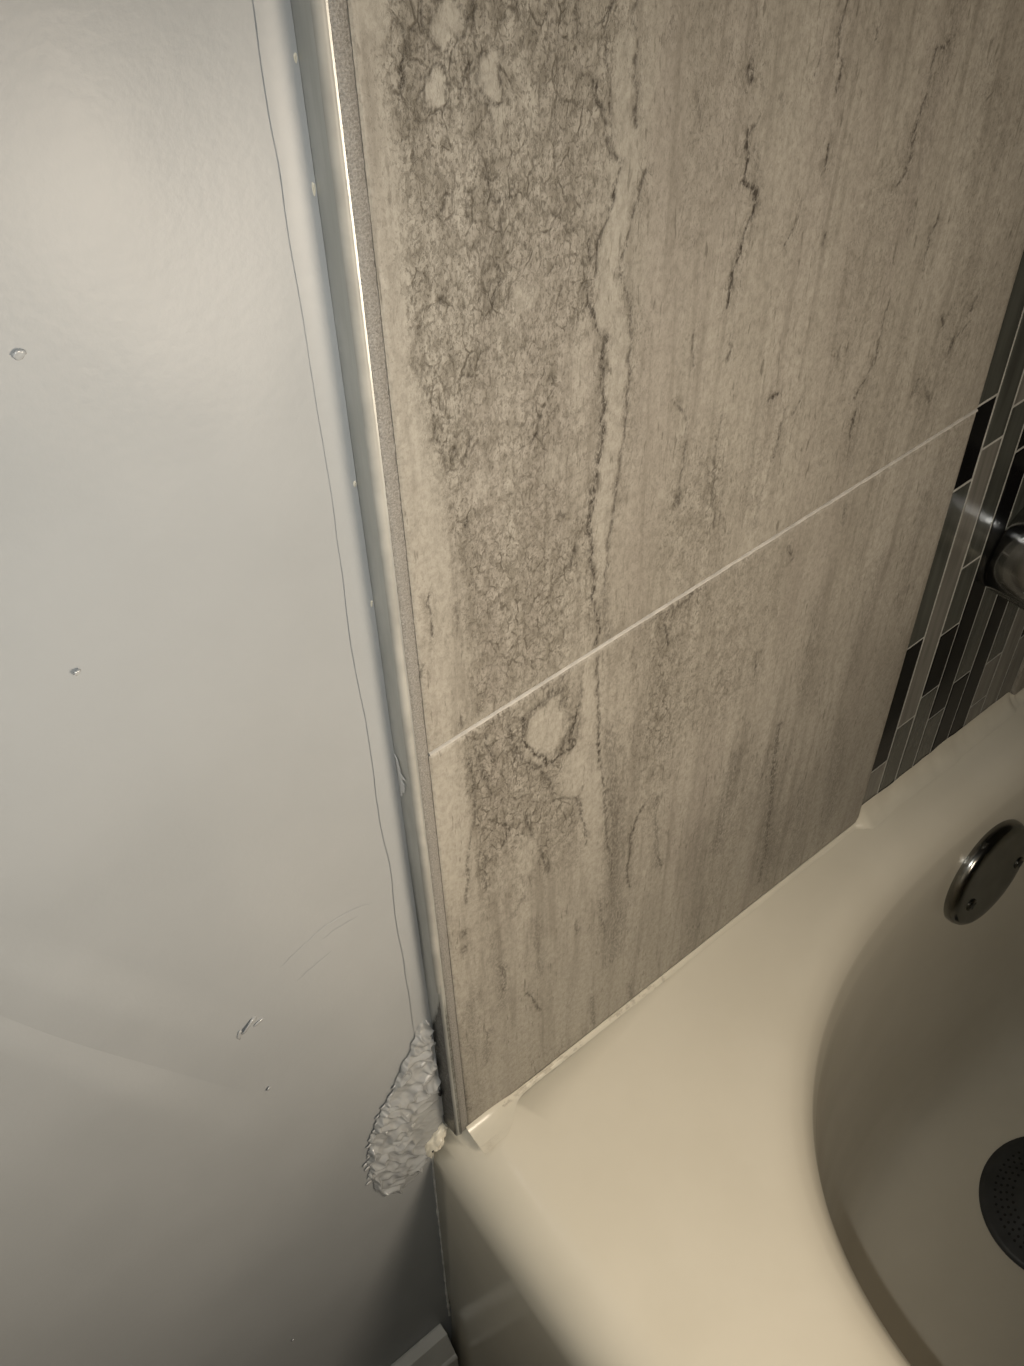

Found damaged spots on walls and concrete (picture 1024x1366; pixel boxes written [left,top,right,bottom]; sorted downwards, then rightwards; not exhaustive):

peeling [362,1019,443,1197]